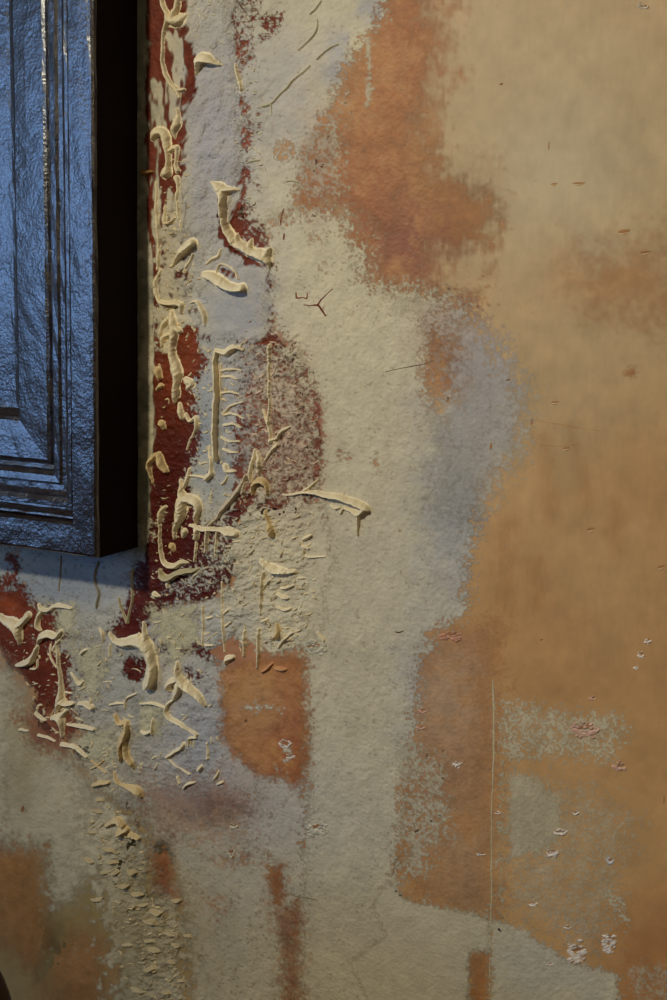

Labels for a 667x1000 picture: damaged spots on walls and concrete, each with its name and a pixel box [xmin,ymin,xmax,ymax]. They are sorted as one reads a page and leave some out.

corrosion [292,0,490,294]
crack [295,288,333,316]
flaking render [0,0,531,1000]
flaking render [487,918,621,1000]